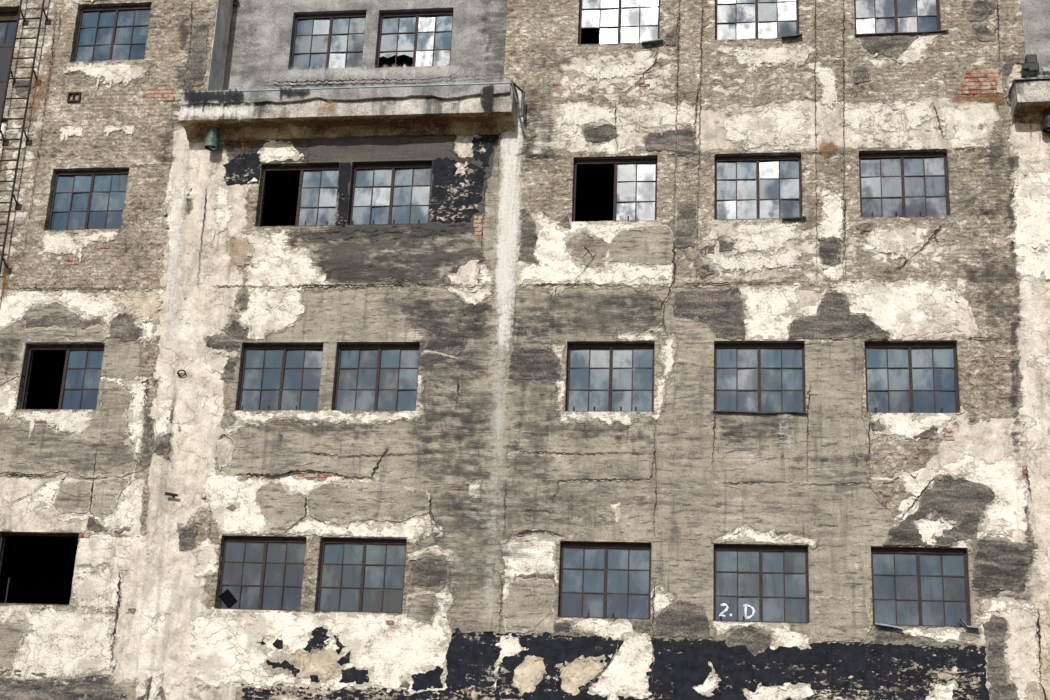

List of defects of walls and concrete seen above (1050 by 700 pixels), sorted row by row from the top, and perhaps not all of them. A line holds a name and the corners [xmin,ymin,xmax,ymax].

flaking render [212,139,333,339]
water stain [407,83,562,347]
crack [197,0,856,341]
flaking render [515,213,685,299]
flaking render [694,190,964,340]
flaking render [192,470,443,578]
crack [236,446,484,534]
crack [503,421,658,539]
flaking render [894,454,1029,546]
flaking render [0,562,127,686]
crack [110,572,121,667]
peeling [186,529,1050,700]